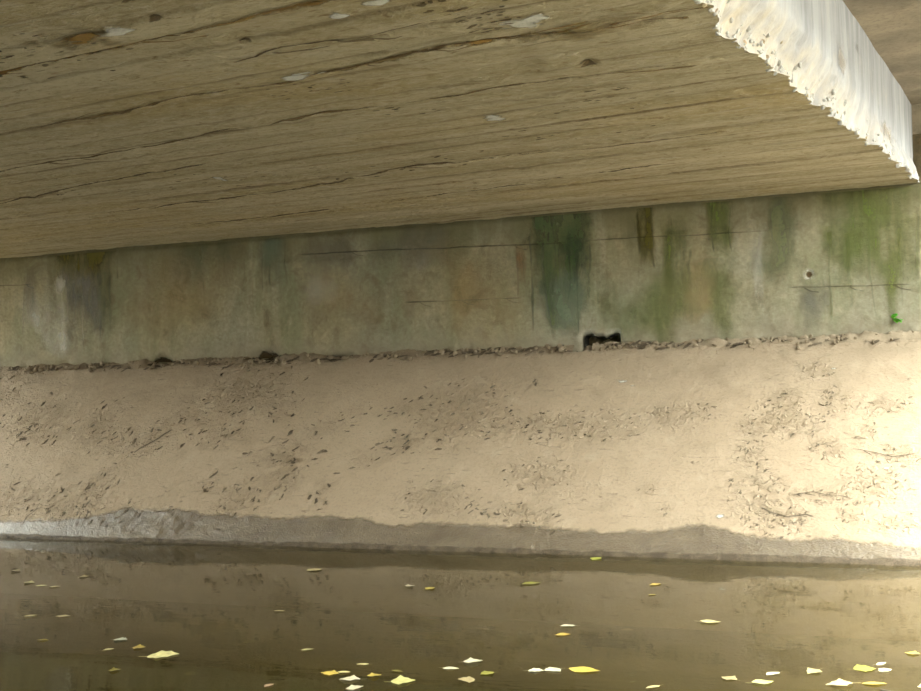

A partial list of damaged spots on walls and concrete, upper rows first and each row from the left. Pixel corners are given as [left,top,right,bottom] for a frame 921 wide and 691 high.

spalling [693,0,913,179]
spalling [0,330,921,391]